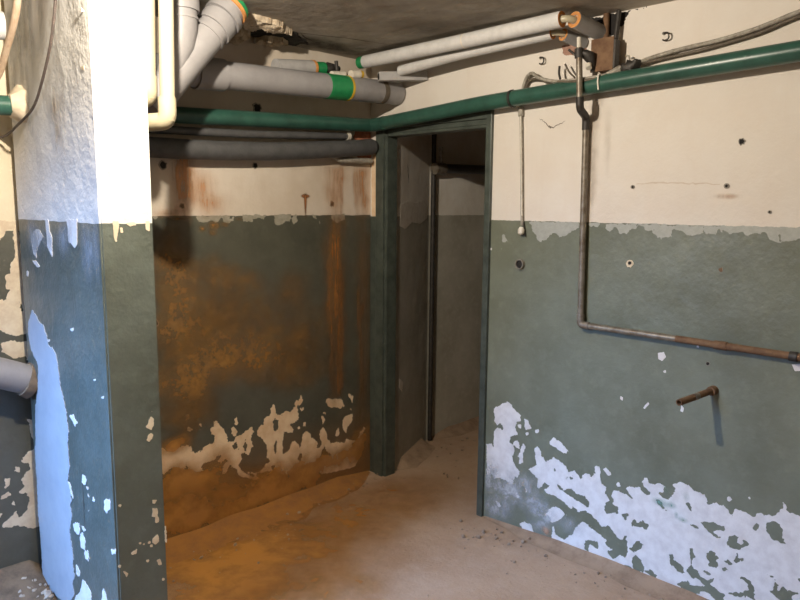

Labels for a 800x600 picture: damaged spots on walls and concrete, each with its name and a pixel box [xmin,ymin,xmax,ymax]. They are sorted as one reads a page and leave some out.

spalling [229,13,309,47]
rust [175,159,215,206]
peeling [113,216,158,242]
peeling [196,214,298,225]
peeling [529,221,800,243]
peeling [0,219,107,600]
peeling [161,394,365,480]
peeling [82,475,121,514]
rust [162,431,369,536]
peeling [486,402,800,600]
peeling [131,500,167,555]